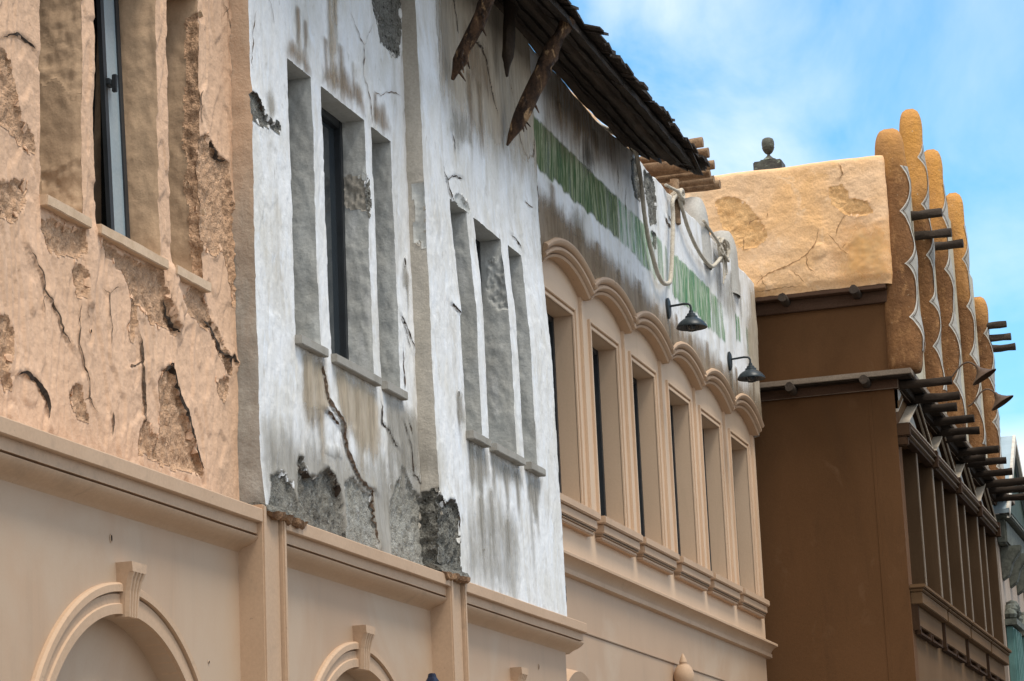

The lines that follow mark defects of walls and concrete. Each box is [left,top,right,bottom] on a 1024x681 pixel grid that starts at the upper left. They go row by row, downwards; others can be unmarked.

spalling [0,47,36,155]
spalling [249,91,281,135]
crack [351,14,399,123]
spalling [372,0,402,59]
spalling [41,10,237,403]
crack [757,220,849,292]
crack [32,252,115,432]
spalling [138,361,204,477]
spalling [269,456,346,538]
crack [298,365,380,542]
spalling [390,465,462,572]
damp [470,441,539,578]